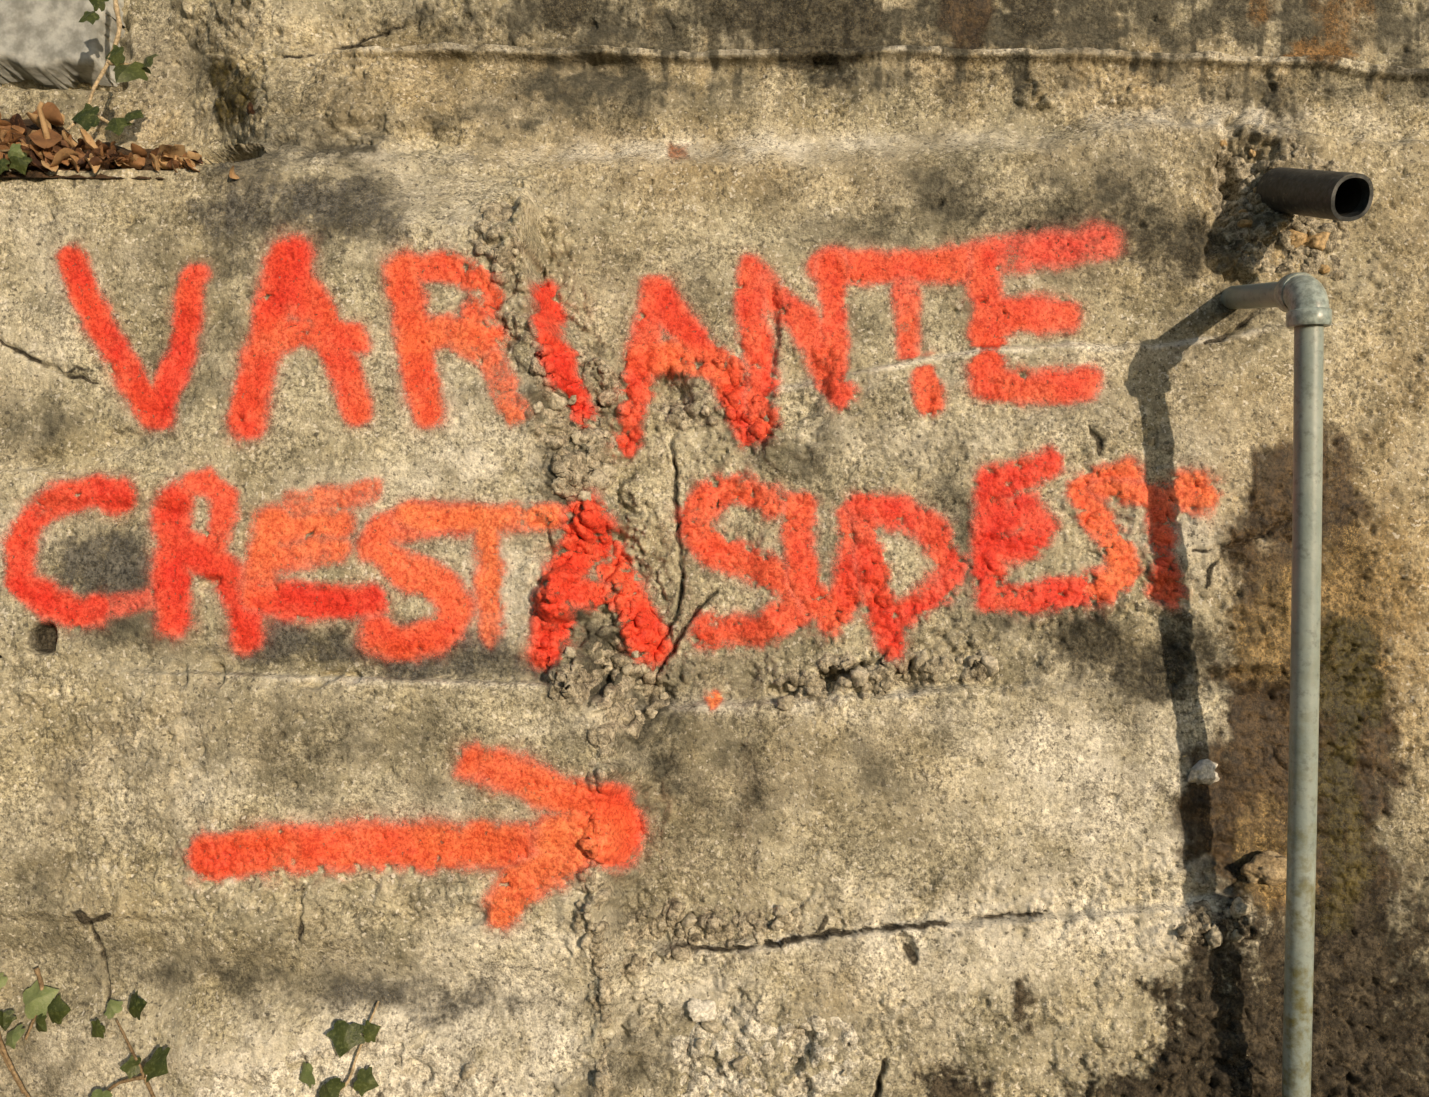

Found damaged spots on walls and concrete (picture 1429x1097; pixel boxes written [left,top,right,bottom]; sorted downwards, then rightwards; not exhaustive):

crack [639,439,718,687]
damp [1175,442,1293,987]
damp [1315,429,1416,984]
crack [72,910,112,1001]
crack [676,909,1047,965]
crack [873,1058,886,1097]